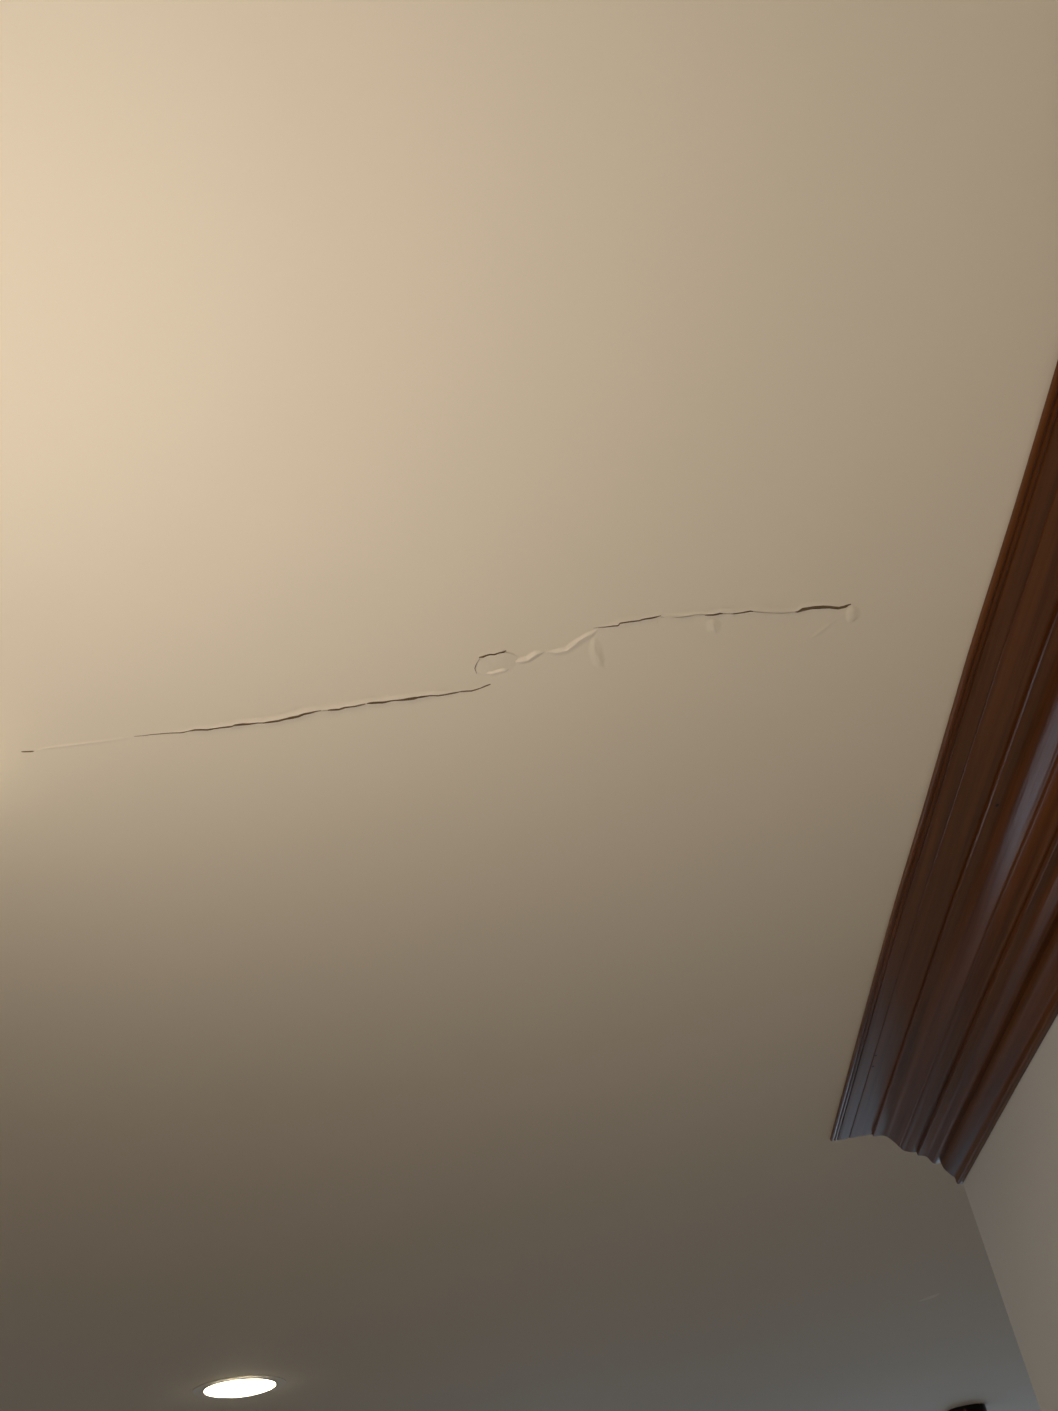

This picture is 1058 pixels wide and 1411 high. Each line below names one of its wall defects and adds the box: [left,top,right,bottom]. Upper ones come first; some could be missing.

crack [594,600,851,635]
crack [21,682,493,752]